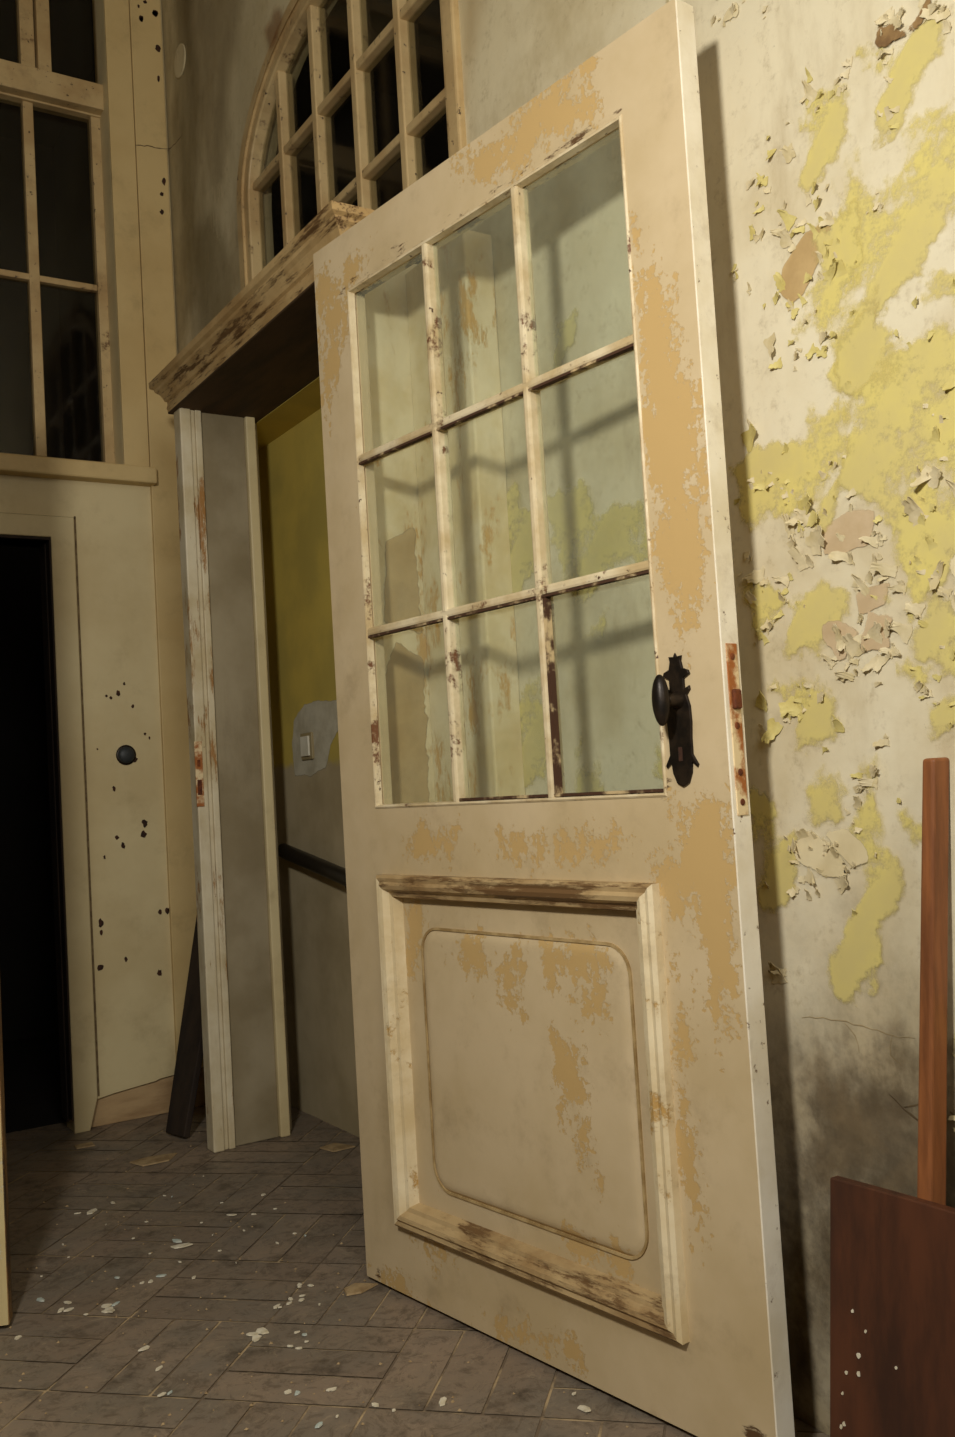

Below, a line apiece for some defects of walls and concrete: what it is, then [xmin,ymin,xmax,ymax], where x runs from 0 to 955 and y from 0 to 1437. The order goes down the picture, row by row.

peeling [711,0,745,27]
peeling [729,0,955,739]
peeling [755,682,845,755]
peeling [896,798,922,841]
peeling [749,764,905,1002]